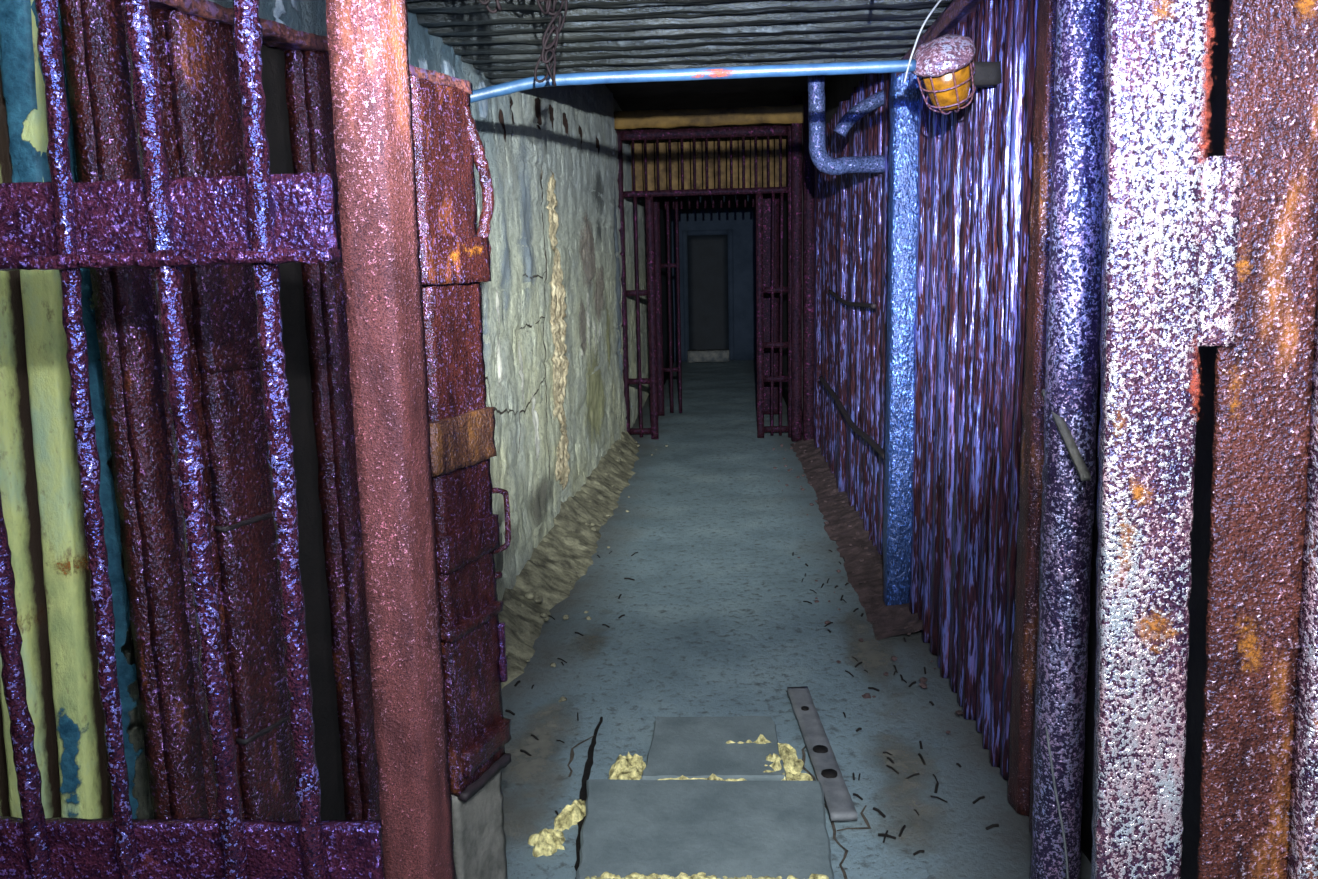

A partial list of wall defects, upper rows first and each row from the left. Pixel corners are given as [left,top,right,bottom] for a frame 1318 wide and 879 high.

corrosion [1298,0,1314,18]
peeling [0,0,51,183]
peeling [58,3,79,183]
peeling [80,268,143,819]
corrosion [1132,483,1152,502]
corrosion [1140,614,1176,649]
corrosion [1239,627,1261,669]
peeling [57,708,88,818]
crack [567,717,603,879]